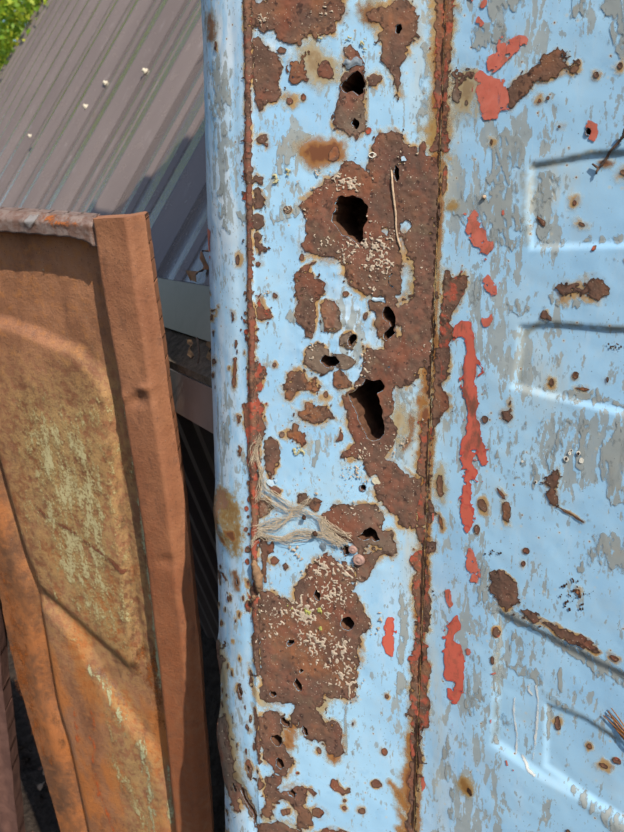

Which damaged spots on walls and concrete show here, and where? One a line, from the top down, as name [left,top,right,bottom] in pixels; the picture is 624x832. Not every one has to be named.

peeling [601,0,624,58]
peeling [453,127,526,261]
peeling [584,234,623,251]
corrosion [555,278,610,305]
corrosion [215,0,481,832]
peeling [453,314,499,533]
corrosion [477,496,489,516]
corrosion [497,488,511,526]
corrosion [540,469,584,523]
peeling [442,589,485,717]
peeling [466,548,624,725]
corrosion [487,569,621,664]